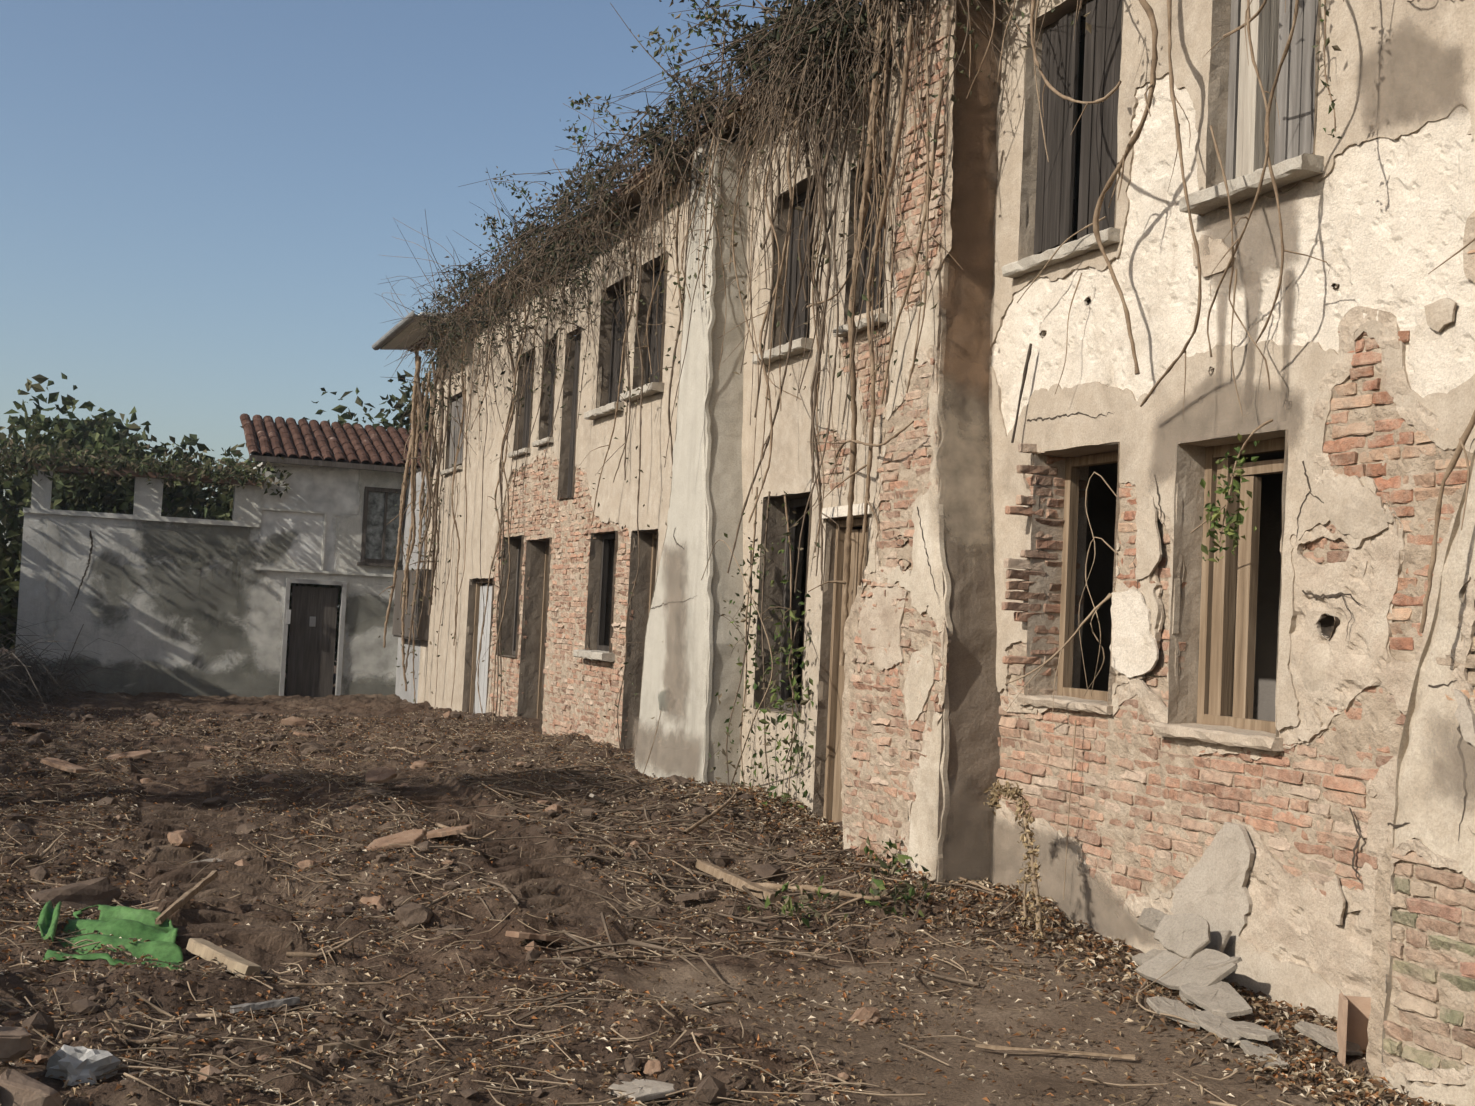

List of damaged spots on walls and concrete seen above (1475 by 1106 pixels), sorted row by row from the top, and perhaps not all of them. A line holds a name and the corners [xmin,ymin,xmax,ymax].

flaking render [488,447,637,749]
flaking render [814,0,955,867]
peeling [991,73,1475,1087]
crack [1428,680,1457,688]
crack [1458,788,1475,841]